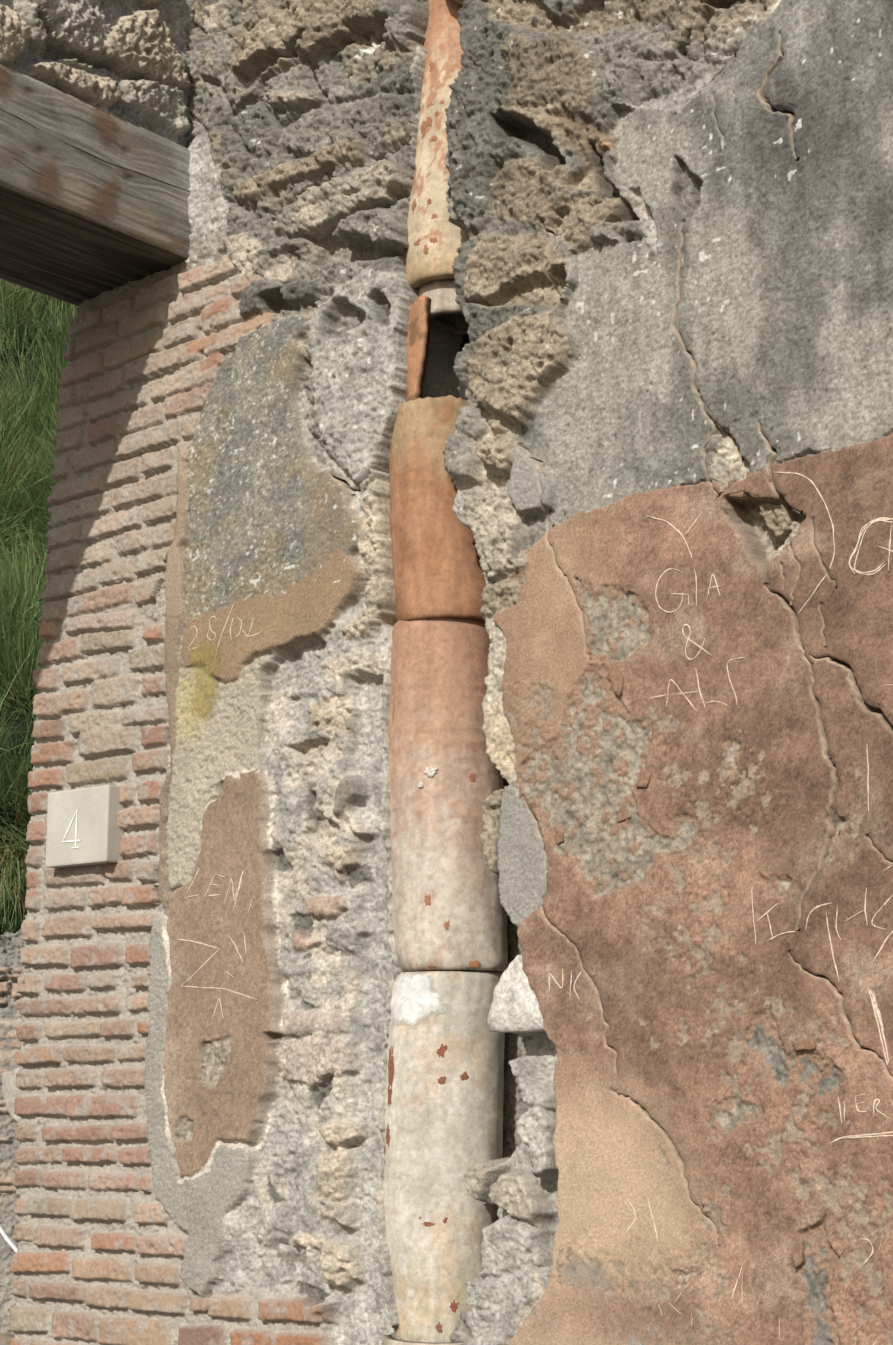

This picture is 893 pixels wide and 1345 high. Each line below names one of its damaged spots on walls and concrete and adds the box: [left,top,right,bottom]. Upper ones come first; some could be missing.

peeling [420,100,445,141]
crack [674,55,736,147]
crack [755,31,800,161]
spalling [675,154,703,213]
peeling [414,236,438,255]
crack [670,221,893,1082]
spalling [516,576,701,899]
spalling [720,738,744,779]
spalling [200,1036,231,1086]
peeling [438,1071,469,1085]
crack [521,794,722,1245]
spalling [791,1215,842,1345]